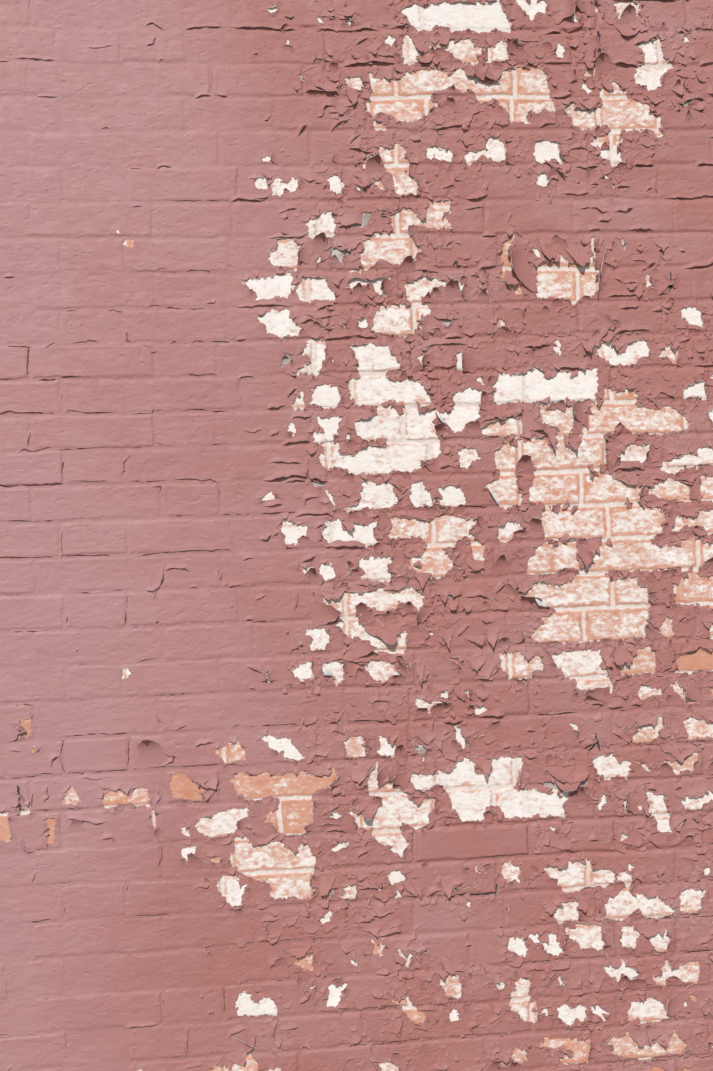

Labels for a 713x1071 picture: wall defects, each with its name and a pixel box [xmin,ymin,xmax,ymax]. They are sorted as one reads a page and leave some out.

peeling [0,782,84,850]
peeling [176,0,713,1071]